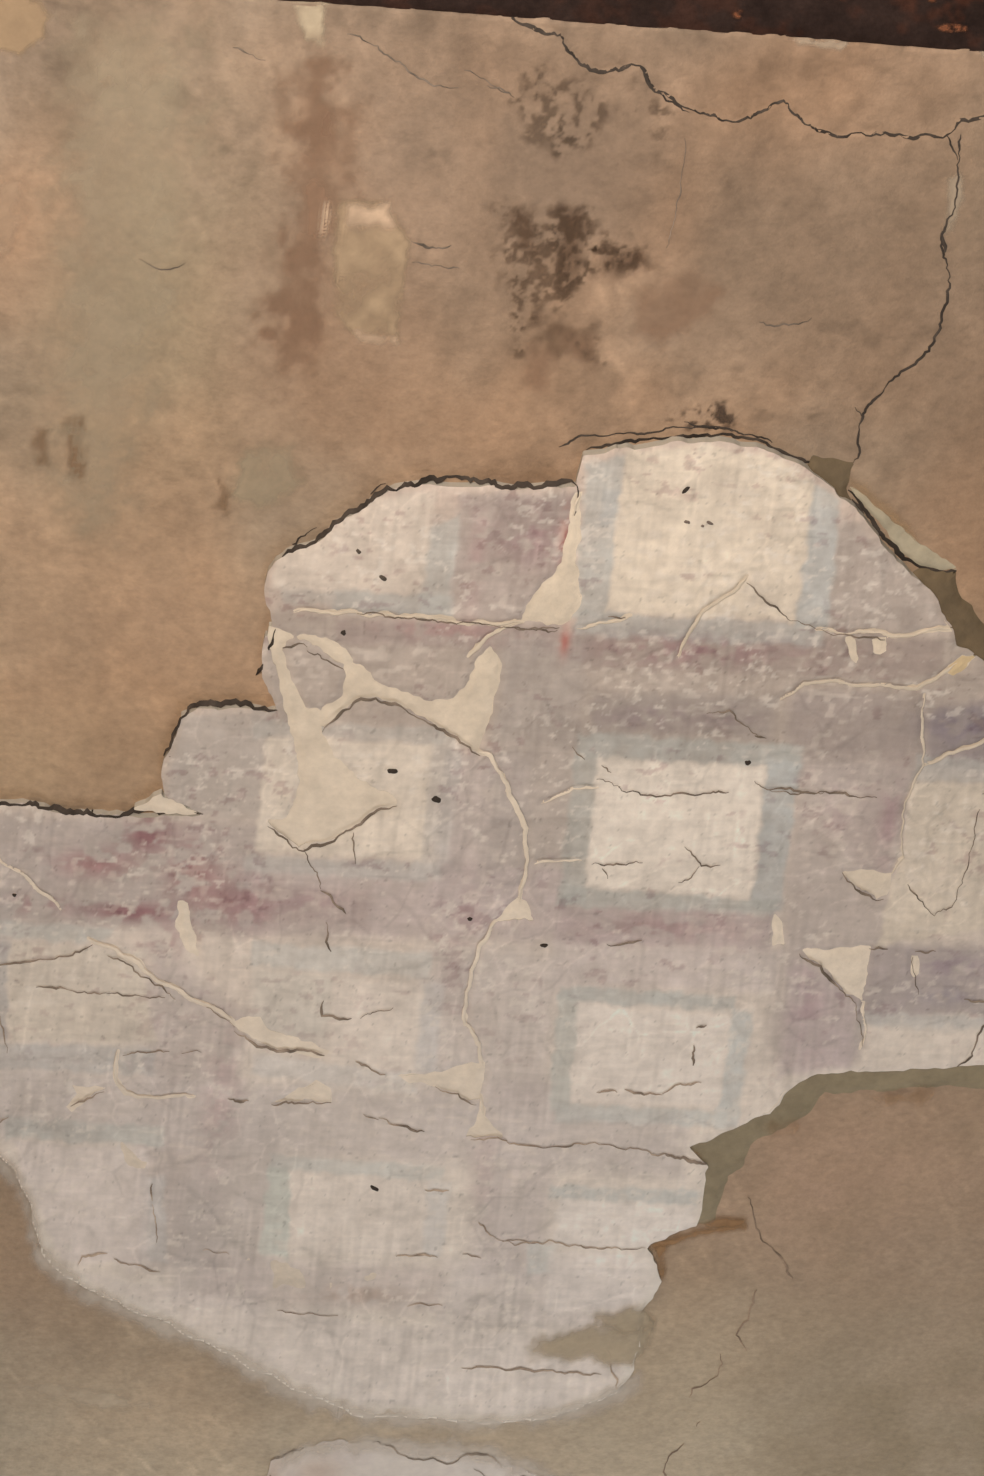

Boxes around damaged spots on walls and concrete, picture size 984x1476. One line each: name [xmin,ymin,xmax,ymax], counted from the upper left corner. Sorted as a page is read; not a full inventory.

rust [939,24,966,32]
crack [511,17,984,573]
spalling [523,493,581,624]
spalling [845,636,885,663]
spalling [267,622,499,845]
spalling [134,789,198,815]
spalling [843,870,891,899]
spalling [177,902,197,954]
spalling [802,945,871,1000]
spalling [231,1016,326,1054]
spalling [533,1308,653,1365]
crack [663,1197,793,1476]